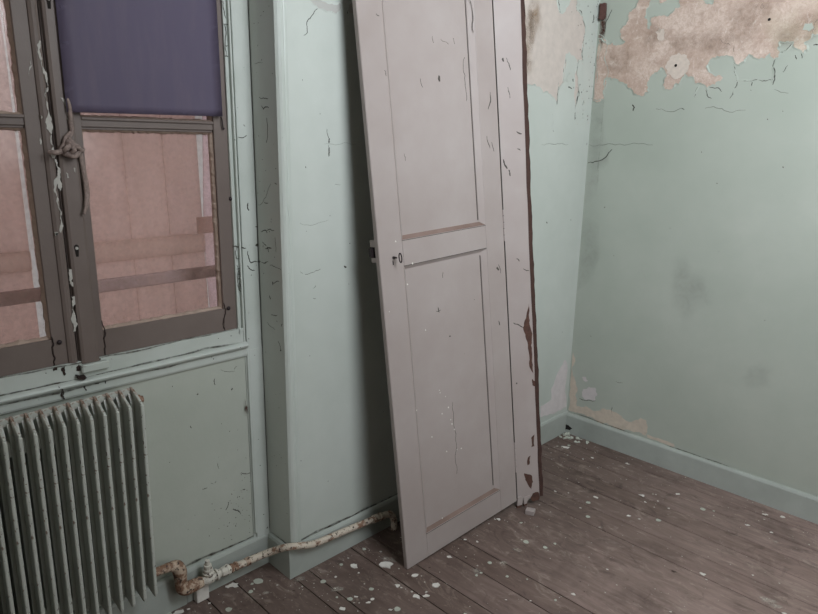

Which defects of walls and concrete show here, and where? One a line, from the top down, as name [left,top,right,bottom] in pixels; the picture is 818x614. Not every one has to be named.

peeling [524,0,818,119]
crack [664,20,818,112]
peeling [28,40,76,236]
peeling [68,269,78,332]
crack [226,4,282,525]
peeling [523,307,535,386]
peeling [540,359,568,418]
peeling [524,435,540,501]